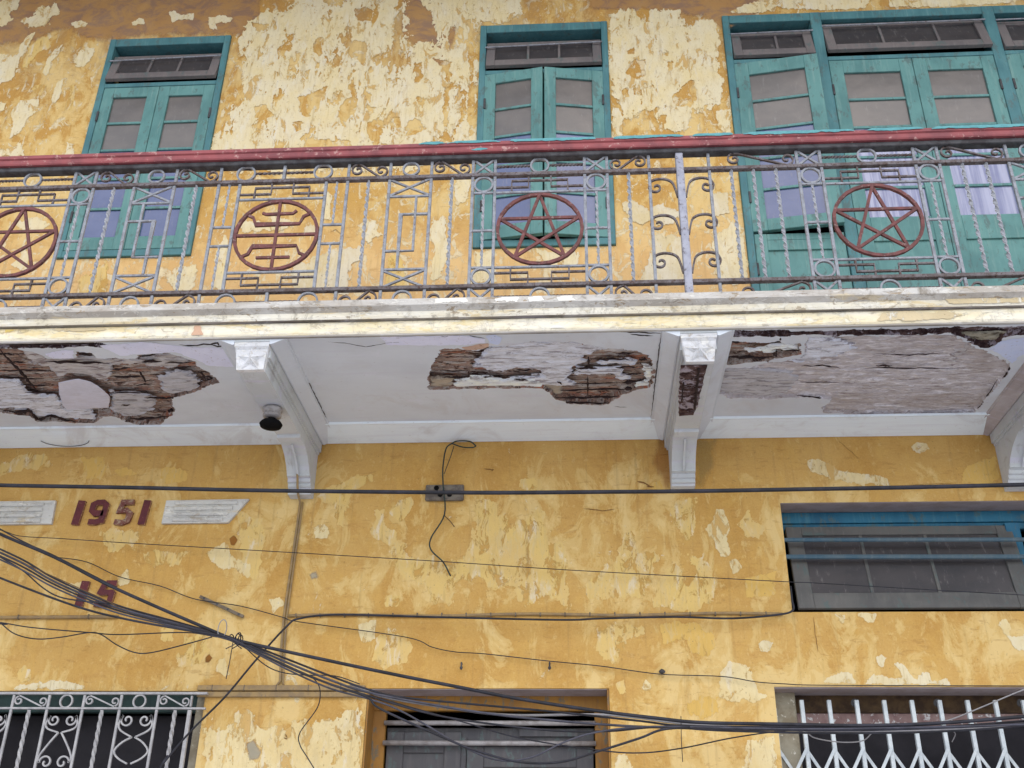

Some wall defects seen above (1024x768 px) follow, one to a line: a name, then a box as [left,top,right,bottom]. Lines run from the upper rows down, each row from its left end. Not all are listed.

peeling [0,0,64,156]
peeling [209,0,596,150]
peeling [607,8,1024,139]
spalling [0,326,234,425]
spalling [380,335,656,405]
spalling [678,365,707,416]
spalling [719,297,1024,414]
peeling [370,495,572,610]
peeling [586,497,765,612]
peeling [202,707,364,768]
peeling [719,661,767,703]
flaking render [824,654,951,685]